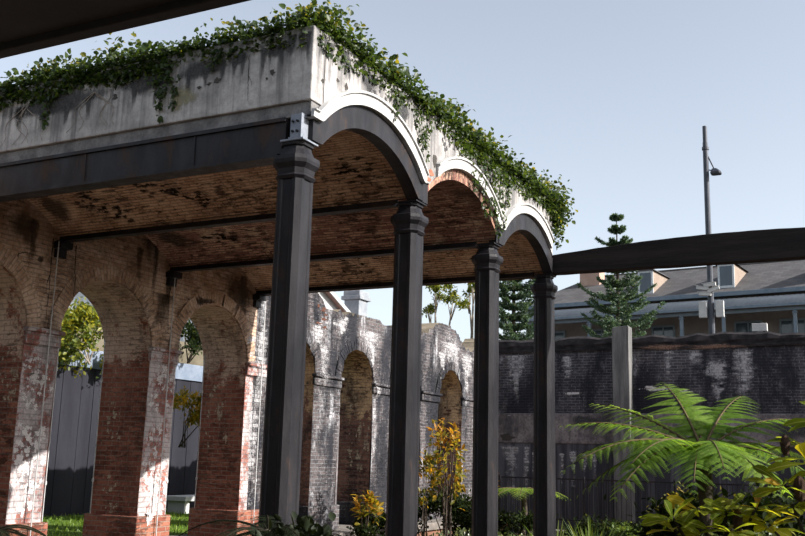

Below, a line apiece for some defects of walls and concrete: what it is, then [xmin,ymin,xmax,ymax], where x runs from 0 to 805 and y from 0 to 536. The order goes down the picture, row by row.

leakage [10,90,104,126]
leakage [123,75,167,103]
leakage [182,51,247,85]
leakage [261,31,351,77]
peeling [0,351,54,411]
peeling [148,363,173,414]
leakage [706,363,725,399]
leakage [736,350,752,390]
peeling [0,422,47,517]
peeling [142,425,168,526]